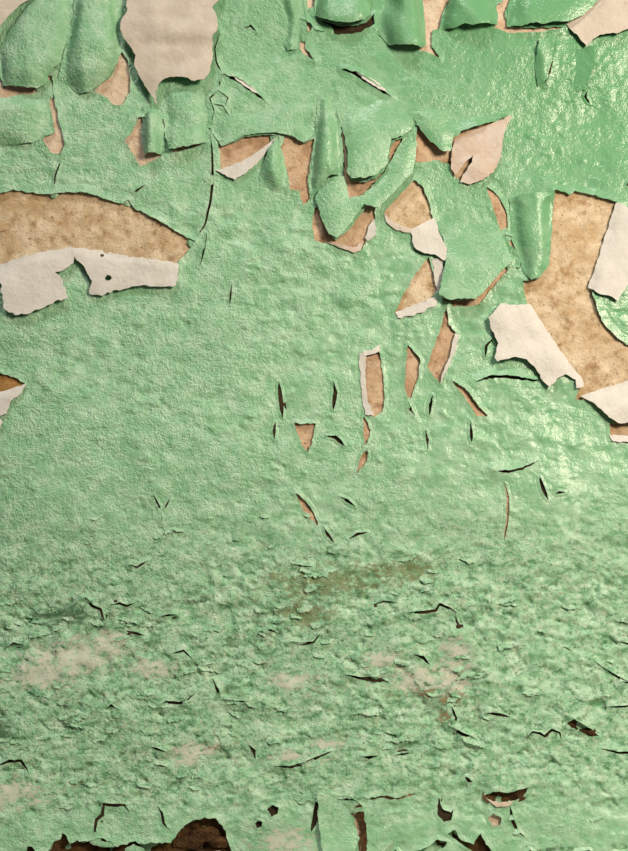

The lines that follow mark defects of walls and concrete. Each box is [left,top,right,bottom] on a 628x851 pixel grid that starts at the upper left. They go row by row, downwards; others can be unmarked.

peeling [0,0,628,443]
peeling [354,345,389,476]
peeling [290,418,320,456]
peeling [291,489,322,529]
crack [69,592,183,641]
crack [340,649,436,688]
crack [589,635,628,714]
crack [443,702,567,746]
crack [243,739,415,836]
crack [89,798,134,847]
spalling [21,811,237,851]
spalling [253,802,282,831]